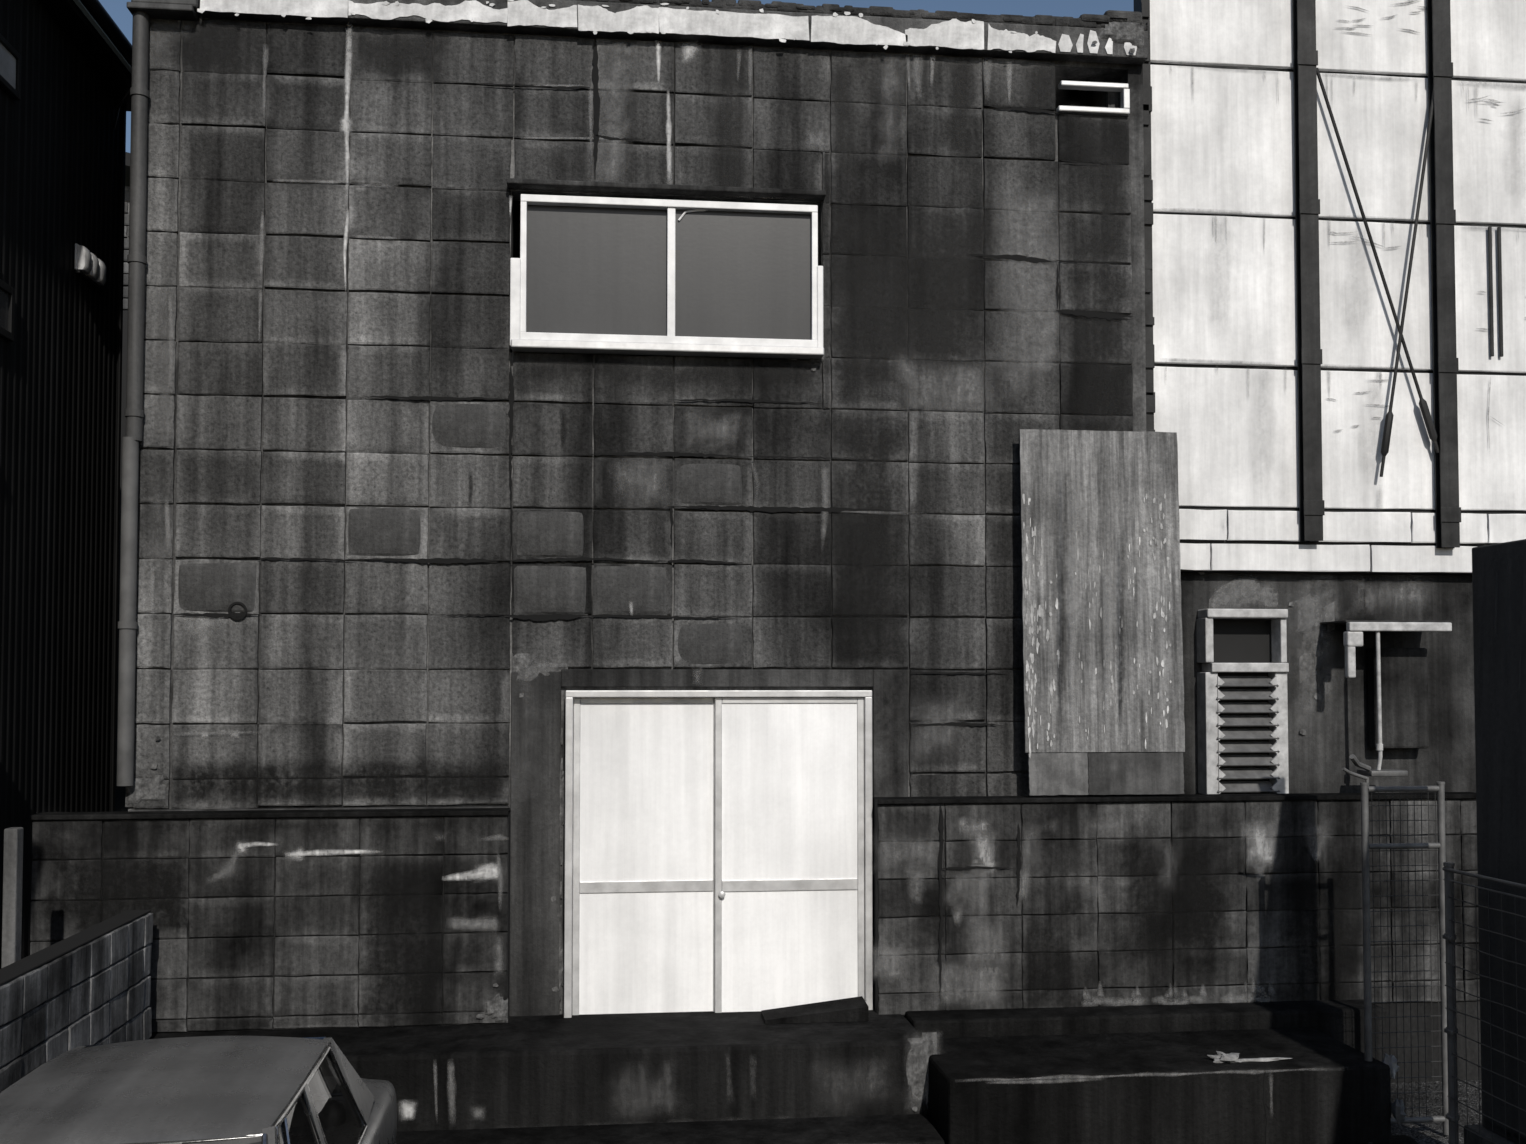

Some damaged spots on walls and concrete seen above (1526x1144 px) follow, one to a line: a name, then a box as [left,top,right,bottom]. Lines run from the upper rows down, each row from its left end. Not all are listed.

leakage [322,43,350,183]
peeling [197,0,1144,56]
leakage [830,214,991,404]
leakage [1010,201,1055,366]
peeling [1022,494,1060,758]
peeling [1075,494,1172,749]